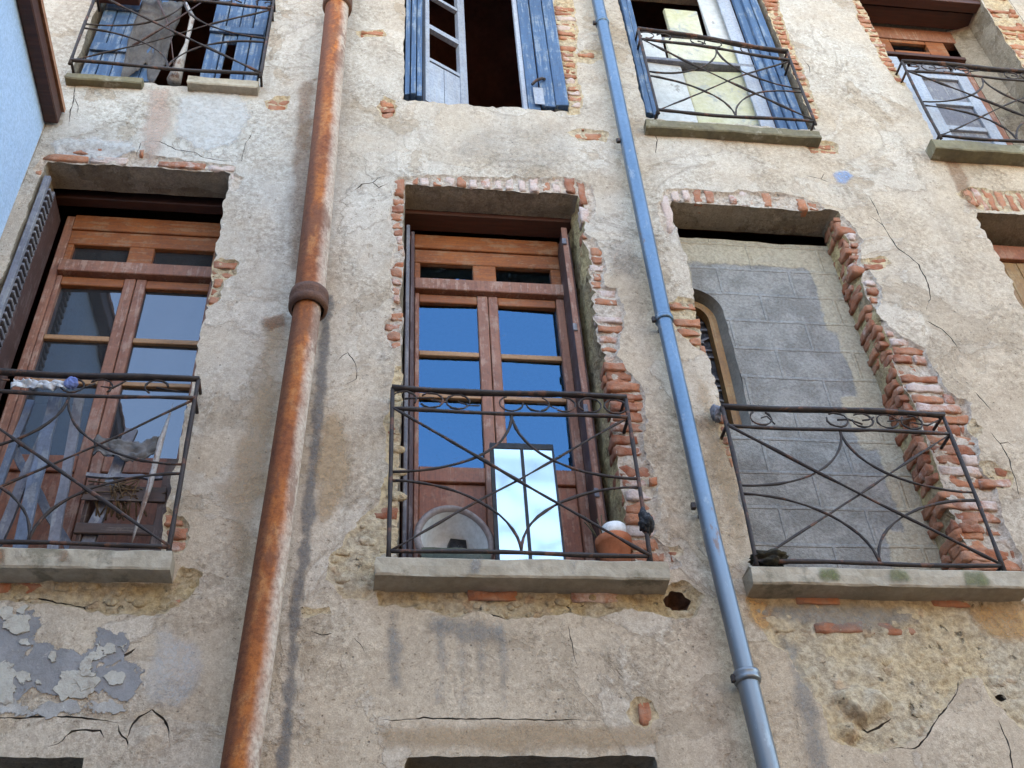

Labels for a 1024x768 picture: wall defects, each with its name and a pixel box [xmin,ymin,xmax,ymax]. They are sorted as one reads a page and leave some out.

spalling [33,149,244,192]
crack [870,198,958,348]
spalling [325,174,706,620]
spalling [657,186,1024,572]
peeling [0,507,203,720]
crack [0,709,170,747]
crack [385,714,600,722]
crack [863,683,958,749]